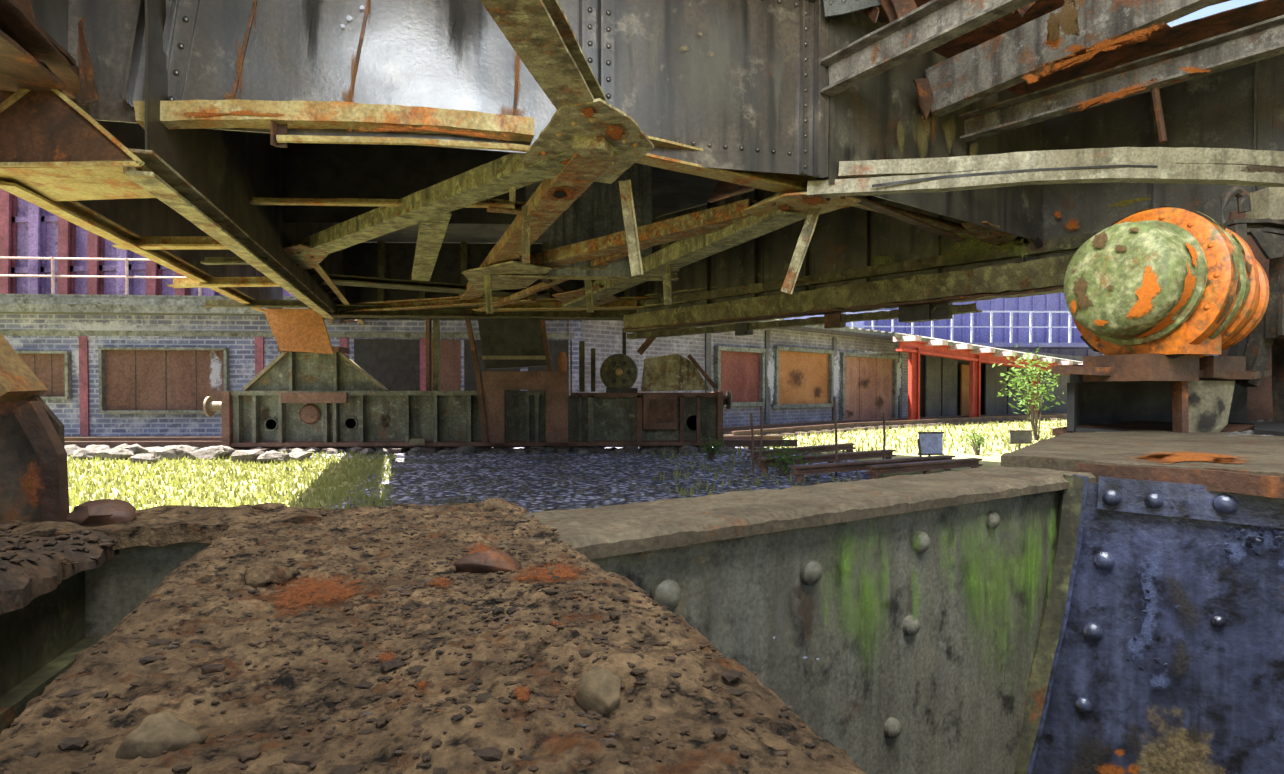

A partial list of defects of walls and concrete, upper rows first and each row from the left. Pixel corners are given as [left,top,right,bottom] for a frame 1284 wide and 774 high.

corrosion [183,49,284,118]
corrosion [343,58,356,102]
corrosion [502,57,522,116]
corrosion [360,124,509,139]
corrosion [1054,210,1079,230]
corrosion [1217,260,1252,323]
corrosion [19,462,44,507]